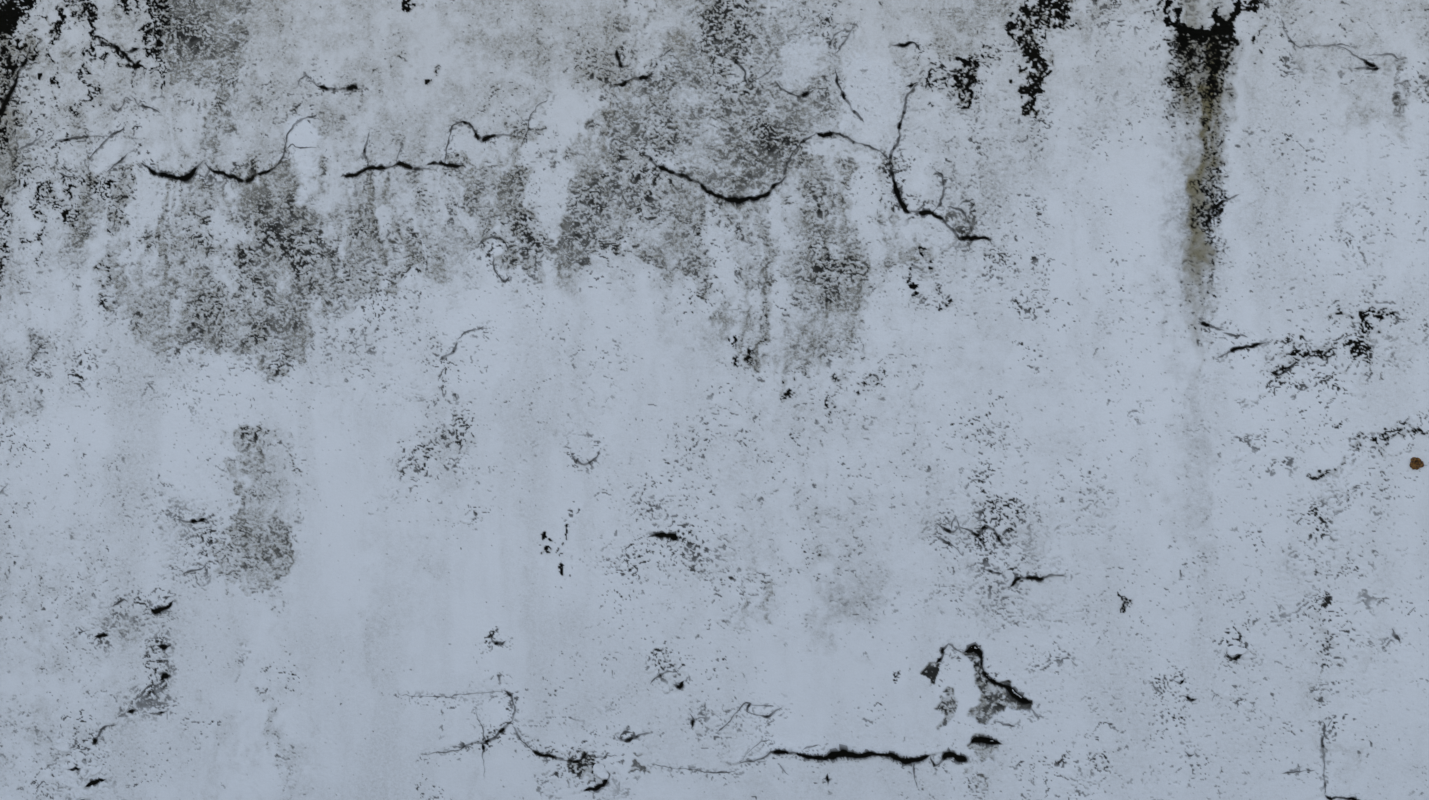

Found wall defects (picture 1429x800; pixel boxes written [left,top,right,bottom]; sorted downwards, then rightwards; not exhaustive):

water stain [0,0,175,156]
crack [17,75,360,184]
crack [340,100,547,179]
crack [643,21,992,242]
water stain [923,0,1082,124]
water stain [0,166,122,290]
water stain [93,227,121,309]
water stain [726,333,769,368]
water stain [823,353,881,424]
water stain [1142,0,1269,598]
crack [401,690,968,788]
flaking render [919,642,1043,797]